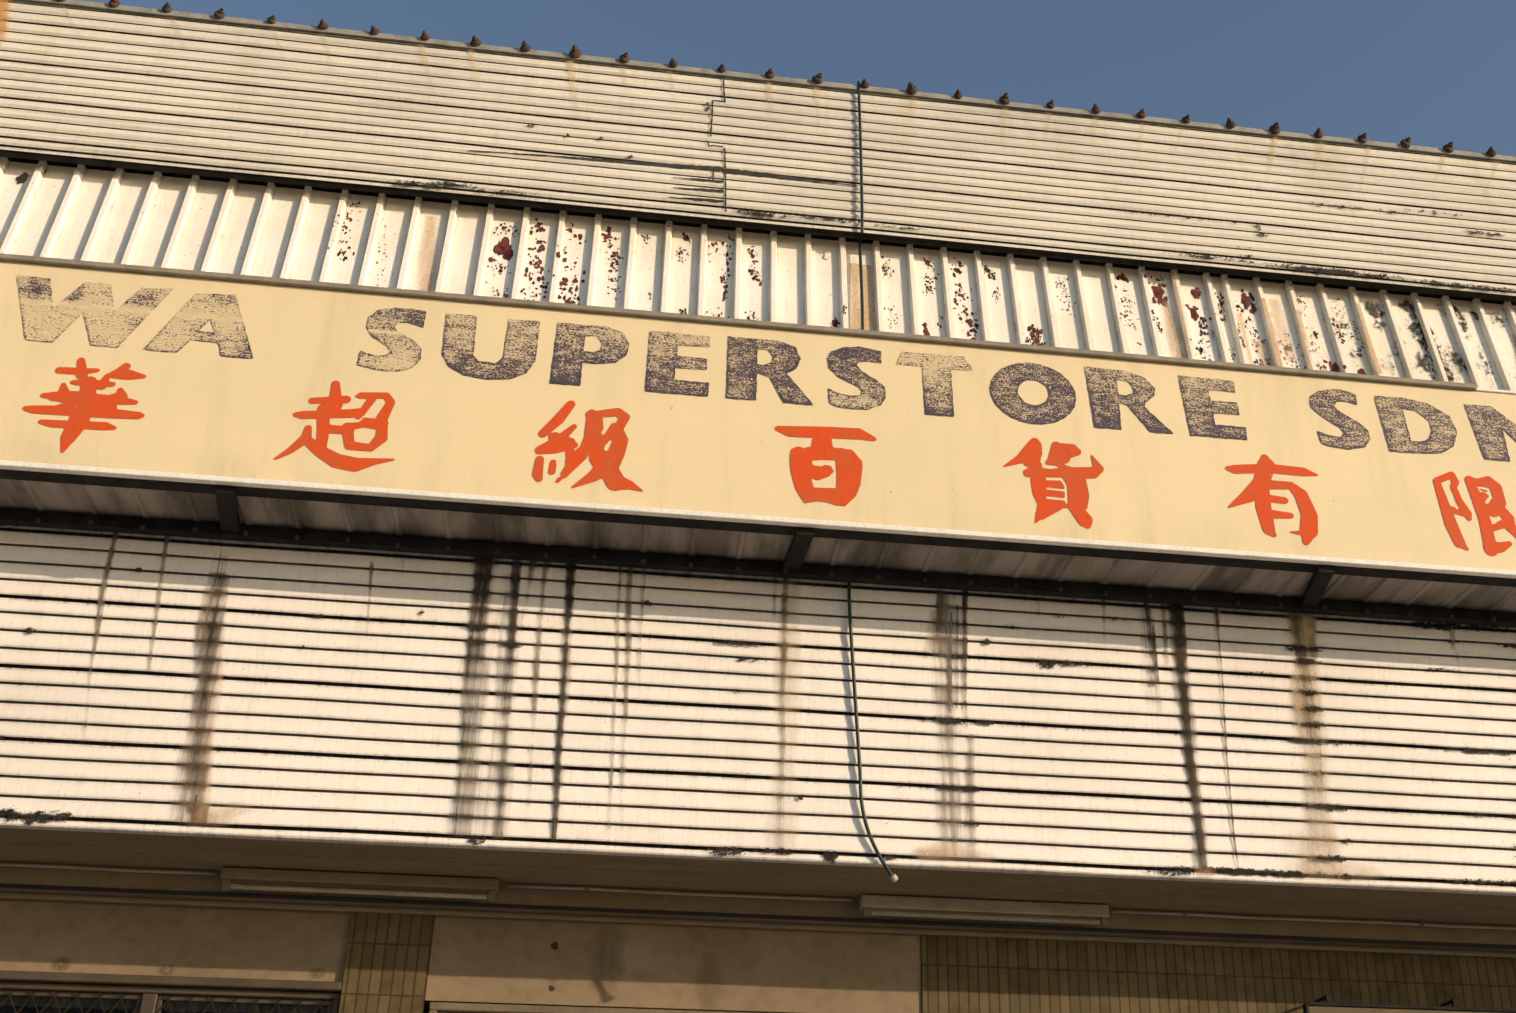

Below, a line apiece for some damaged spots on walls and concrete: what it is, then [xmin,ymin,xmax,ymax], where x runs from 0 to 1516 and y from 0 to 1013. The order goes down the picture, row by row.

corrosion [1262,298,1283,367]
corrosion [1357,304,1381,372]
leakage [179,556,227,808]
leakage [452,557,577,845]
leakage [924,590,1010,843]
leakage [1020,658,1092,669]
leakage [1139,603,1366,880]
leakage [1443,878,1516,887]